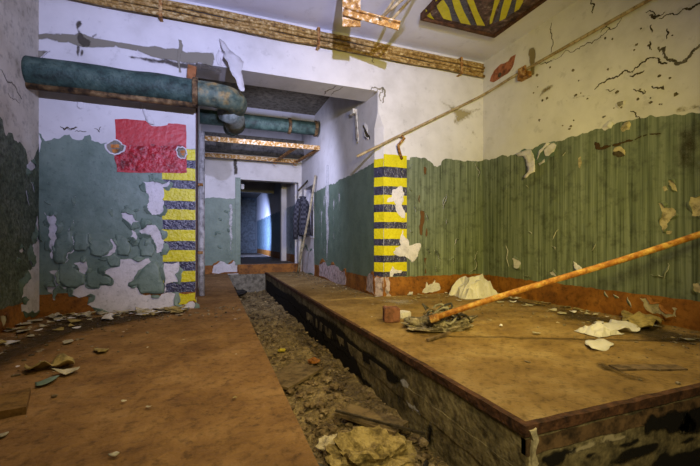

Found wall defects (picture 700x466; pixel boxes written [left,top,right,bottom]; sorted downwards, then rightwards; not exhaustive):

leakage [39,21,222,73]
peeling [216,47,228,66]
crack [594,2,700,94]
flaking render [104,139,126,155]
flaking render [176,146,188,159]
peeling [387,186,412,218]
peeling [658,201,679,234]
peeling [686,194,700,219]
peeling [19,174,200,318]
peeling [365,266,402,302]
peeling [640,296,677,321]